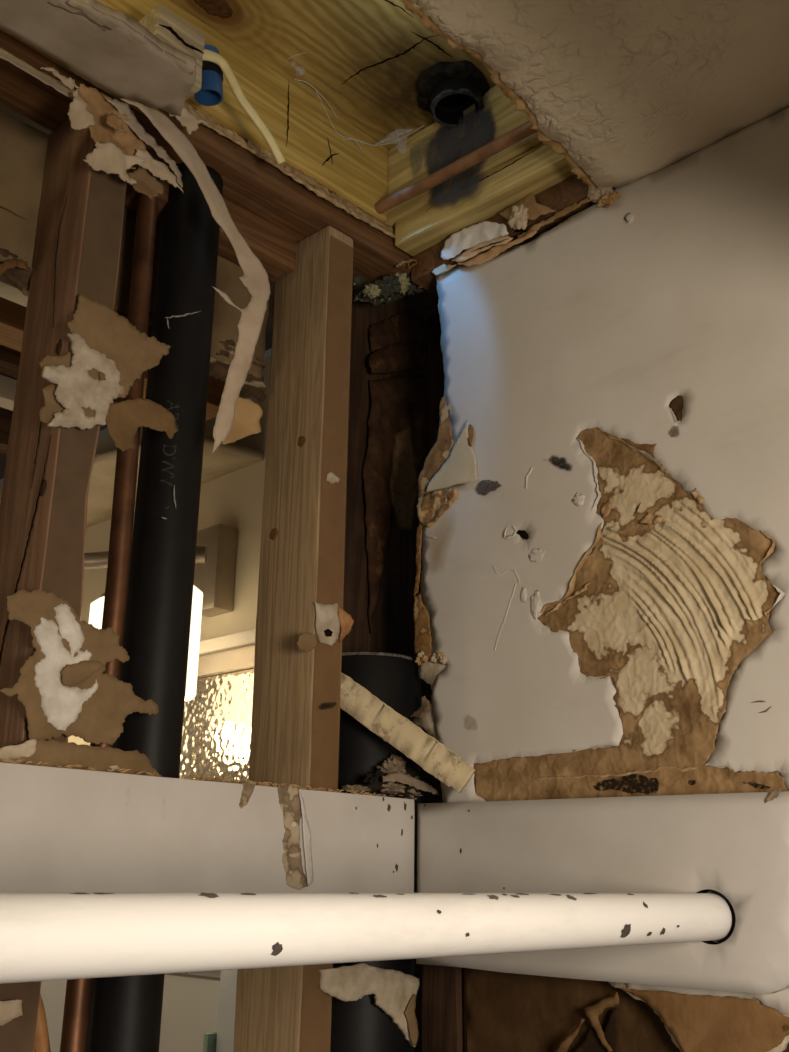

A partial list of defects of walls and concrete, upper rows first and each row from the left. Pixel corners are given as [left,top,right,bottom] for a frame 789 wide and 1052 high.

crack [341,0,452,85]
leakage [410,109,494,206]
peeling [413,396,478,666]
peeling [473,428,789,803]
peeling [277,784,313,890]
peeling [271,942,283,956]
peeling [616,987,789,1052]